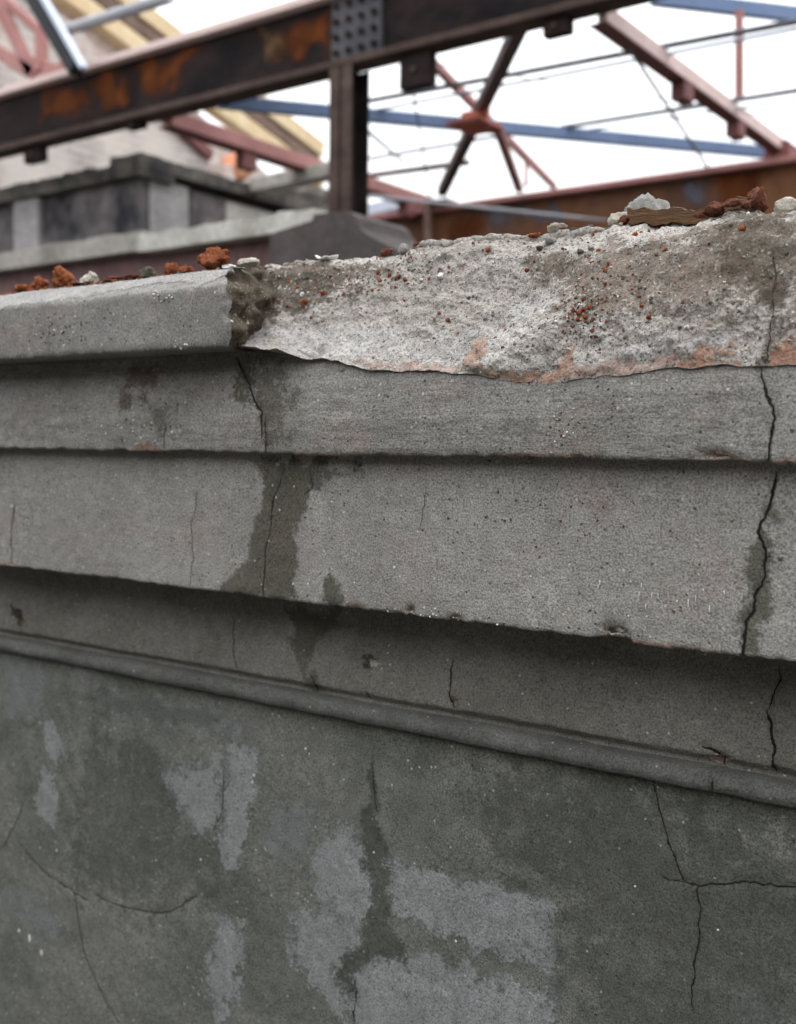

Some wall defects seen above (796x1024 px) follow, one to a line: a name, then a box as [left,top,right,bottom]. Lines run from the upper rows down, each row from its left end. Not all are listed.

spalling [225,210,796,384]
crack [235,357,284,597]
damp [220,454,344,692]
crack [741,248,777,655]
damp [2,652,74,832]
crack [0,804,197,1022]
damp [71,670,562,1024]
crack [652,781,796,1011]
crack [766,667,782,771]